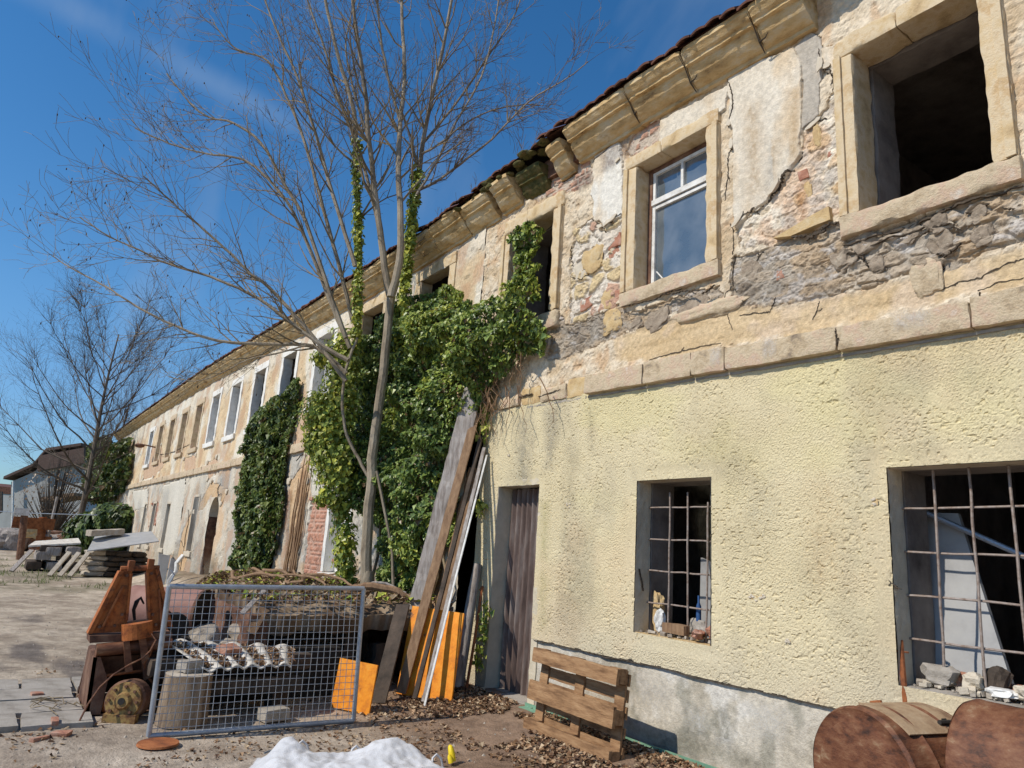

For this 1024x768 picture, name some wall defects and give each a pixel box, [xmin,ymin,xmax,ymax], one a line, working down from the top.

crack [621,80,827,360]
spalling [533,33,1024,360]
crack [791,185,1024,296]